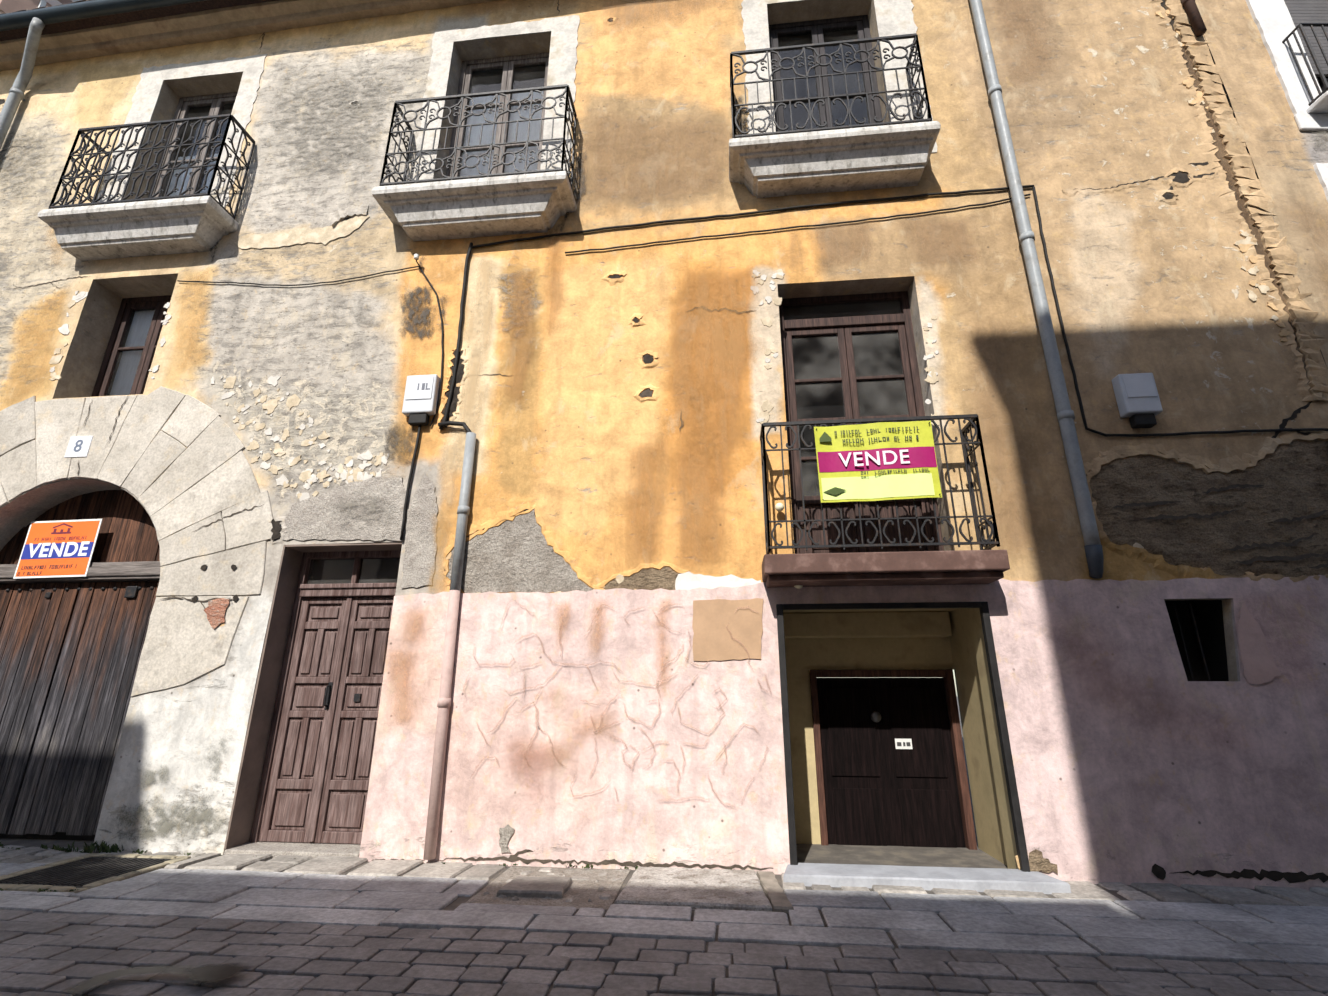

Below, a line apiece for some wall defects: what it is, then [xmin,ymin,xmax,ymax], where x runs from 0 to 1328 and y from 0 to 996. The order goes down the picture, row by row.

crack [1063,0,1328,474]
water stain [402,286,445,338]
peeling [211,375,390,501]
water stain [386,425,415,463]
spalling [1086,431,1328,582]
spalling [441,503,689,593]
flaking render [204,596,234,631]
crack [372,849,770,870]
crack [1174,869,1328,883]